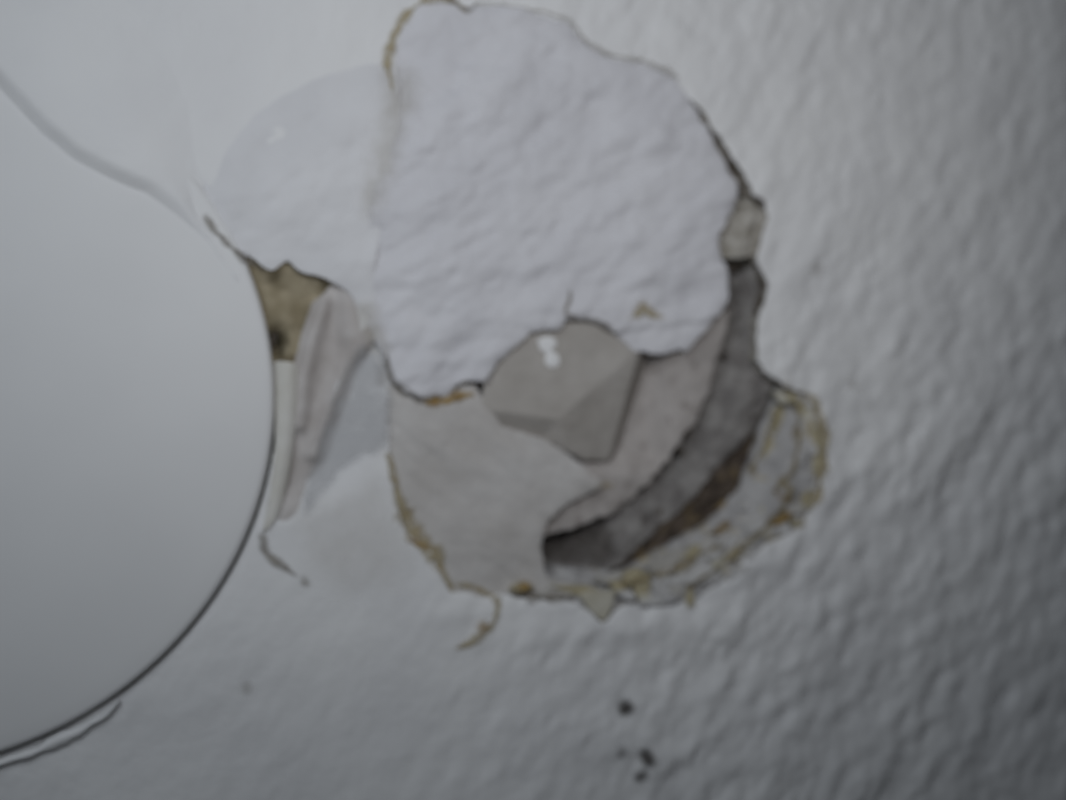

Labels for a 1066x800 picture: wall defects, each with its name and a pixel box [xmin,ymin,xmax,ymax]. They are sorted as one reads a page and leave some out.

flaking render [244,0,823,622]